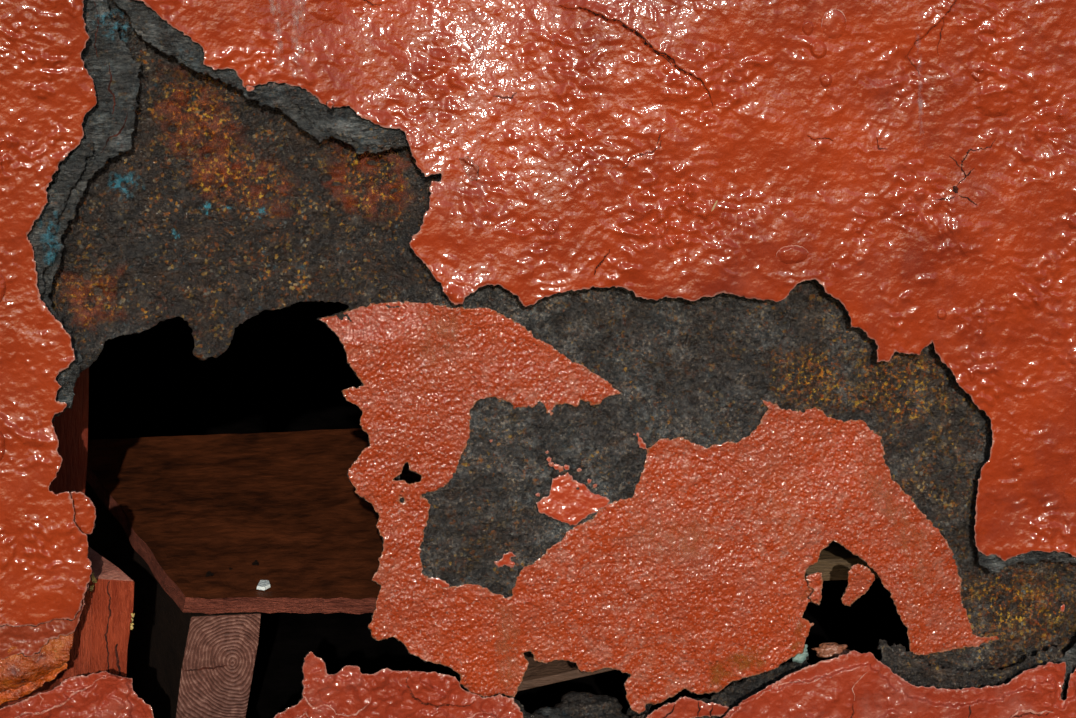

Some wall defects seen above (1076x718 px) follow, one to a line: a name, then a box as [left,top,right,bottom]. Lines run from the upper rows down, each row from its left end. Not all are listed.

crack [558,5,713,106]
crack [905,0,957,74]
spalling [27,0,408,422]
peeling [545,451,597,488]
peeling [494,552,516,568]
spalling [972,540,1076,575]
peeling [429,577,449,588]
peeling [805,572,823,605]
peeling [841,563,875,607]
rust [877,639,1064,690]
spalling [1057,643,1076,684]